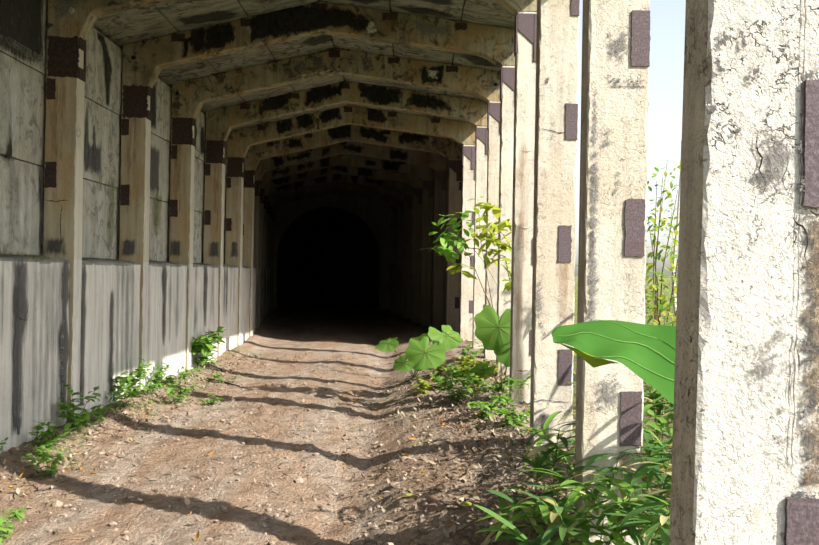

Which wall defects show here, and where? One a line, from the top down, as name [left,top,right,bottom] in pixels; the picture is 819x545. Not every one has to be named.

damp [0,0,43,160]
damp [77,113,101,173]
damp [259,92,291,114]
damp [250,0,386,78]
damp [272,83,425,192]
damp [411,94,451,110]
damp [421,65,444,84]
crack [801,0,809,40]
damp [12,261,37,432]
damp [47,239,70,416]